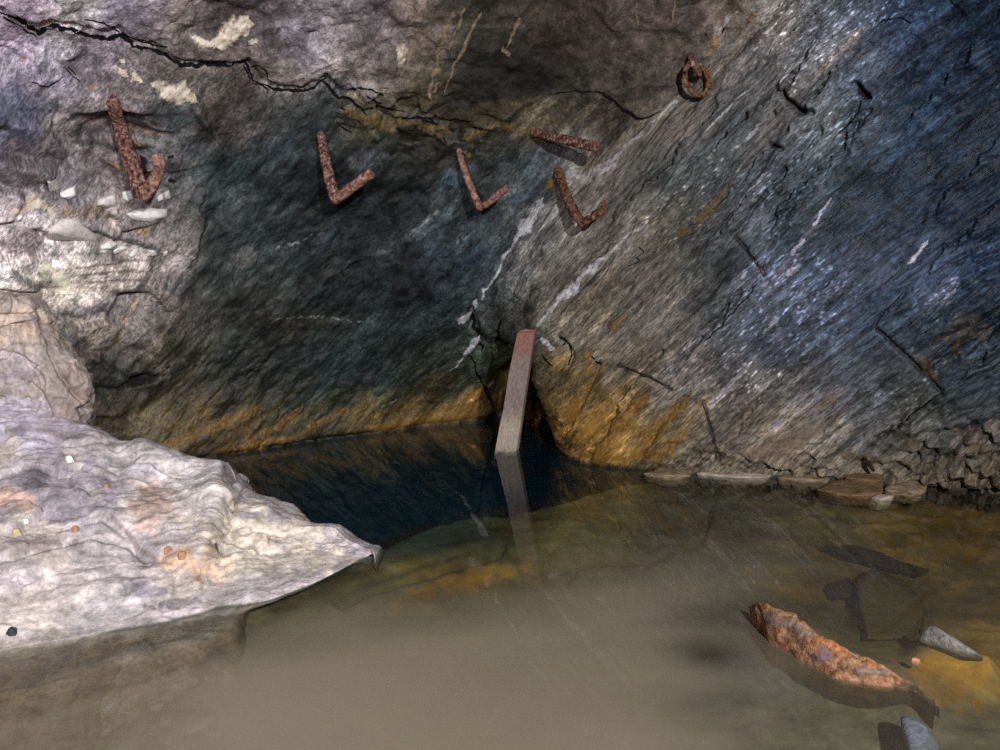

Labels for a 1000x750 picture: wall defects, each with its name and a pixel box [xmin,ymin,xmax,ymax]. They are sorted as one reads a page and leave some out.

crack [0,11,455,147]